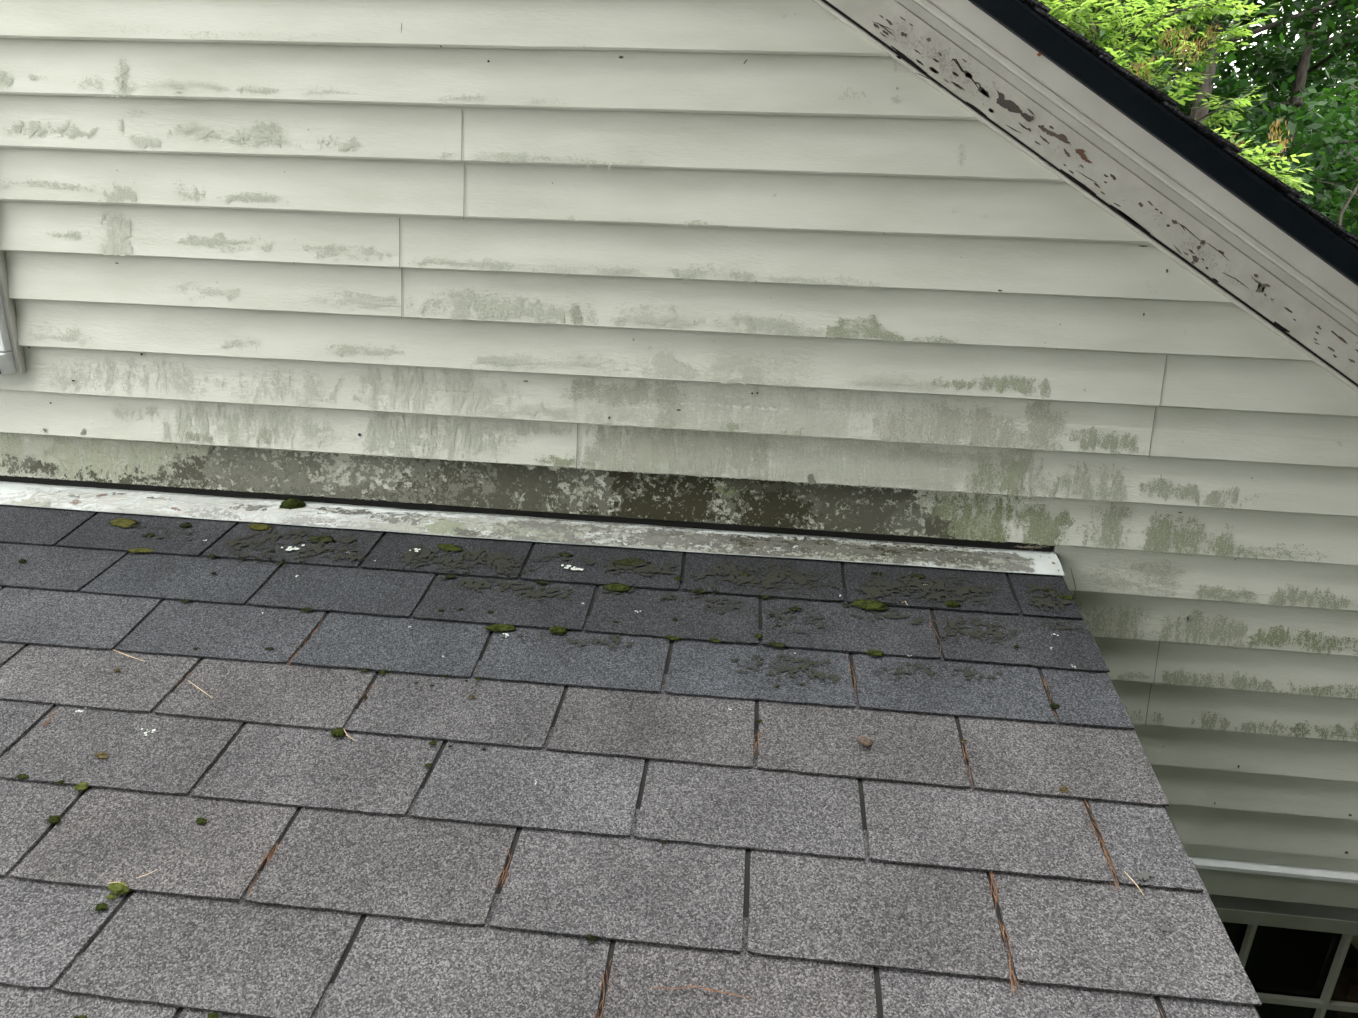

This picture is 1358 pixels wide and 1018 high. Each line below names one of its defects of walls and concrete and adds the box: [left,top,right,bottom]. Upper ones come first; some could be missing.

peeling [874,15,1093,174]
peeling [1184,240,1224,284]
peeling [1252,274,1296,321]
peeling [1314,325,1358,363]
damp [0,286,1036,572]